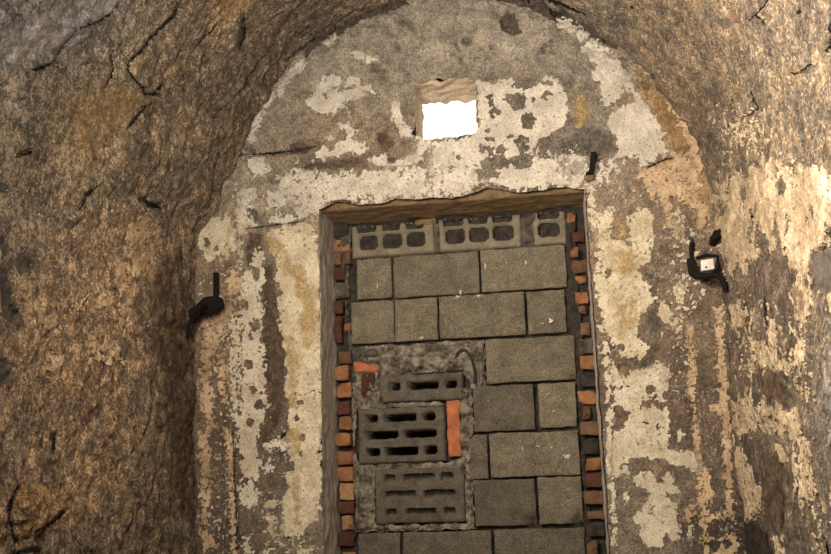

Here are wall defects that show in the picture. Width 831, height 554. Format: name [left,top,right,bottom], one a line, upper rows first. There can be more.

crack [32,0,122,71]
crack [103,6,179,129]
crack [238,10,246,50]
crack [527,0,586,15]
crack [748,0,768,24]
crack [790,23,831,75]
crack [240,146,317,155]
peeling [193,0,831,554]
water stain [744,456,786,554]